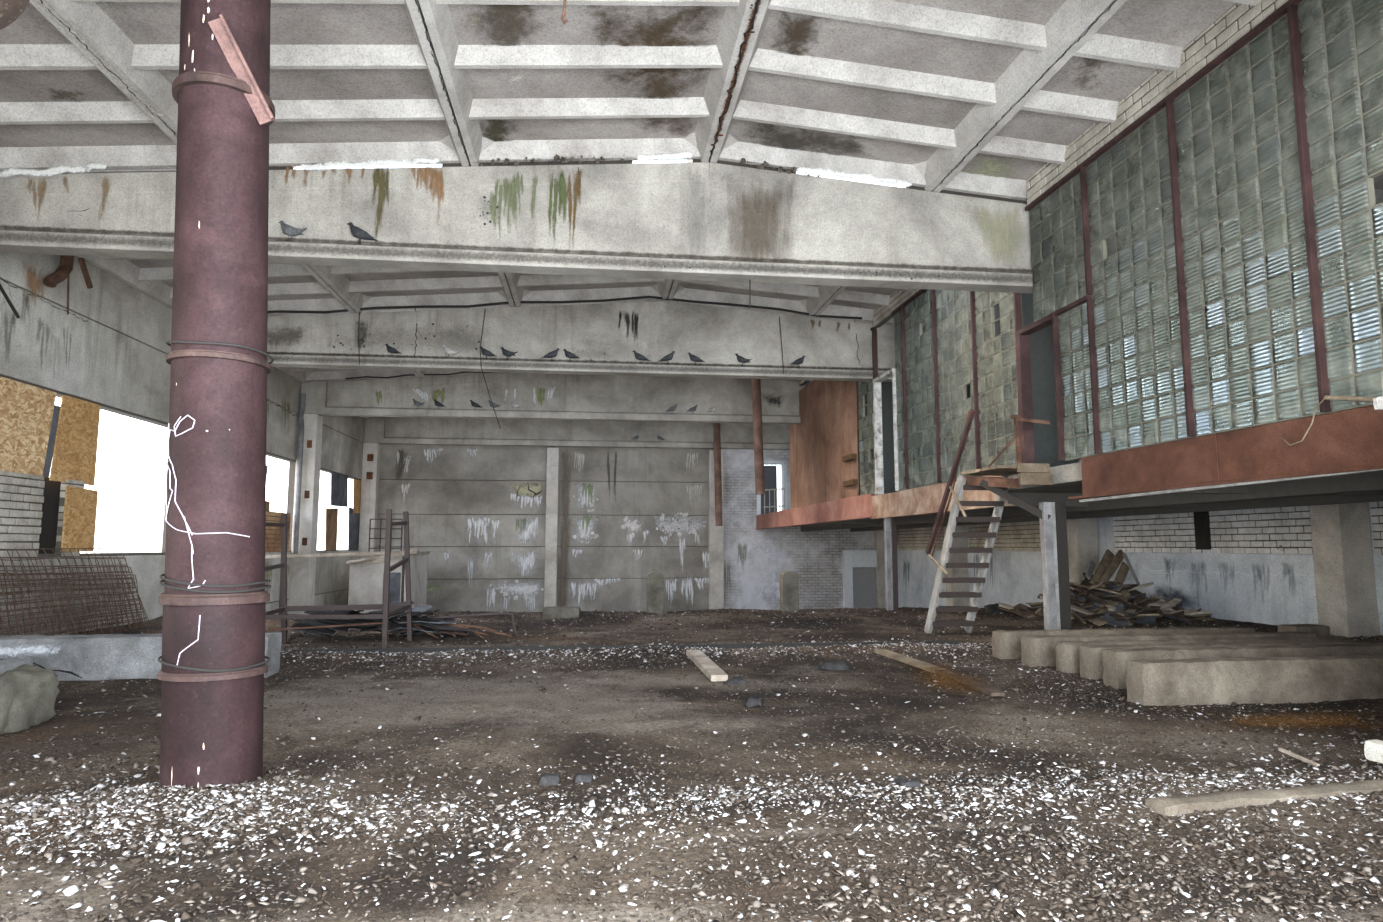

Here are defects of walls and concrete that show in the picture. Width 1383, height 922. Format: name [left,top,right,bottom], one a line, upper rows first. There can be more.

damp [596,6,710,46]
damp [781,15,815,56]
damp [614,68,703,99]
crack [710,0,761,155]
rust [29,180,46,209]
damp [0,234,174,245]
damp [268,158,1032,282]
damp [468,517,500,582]
damp [511,493,542,576]
damp [558,452,620,607]
damp [627,519,709,607]
damp [1157,589,1190,608]